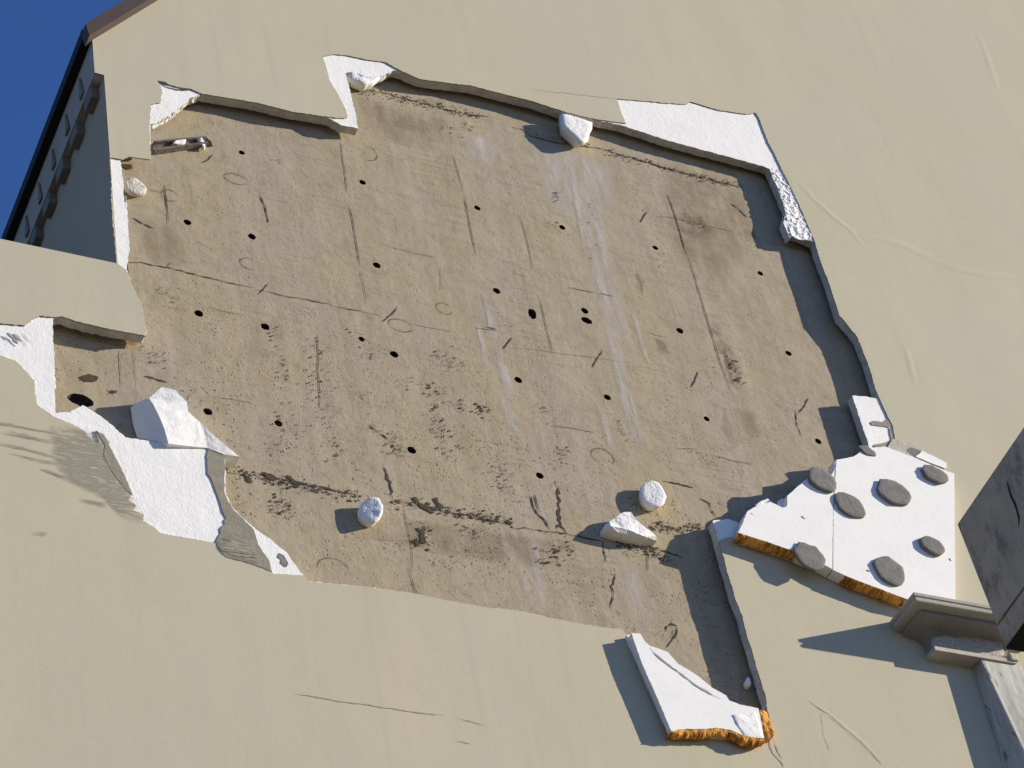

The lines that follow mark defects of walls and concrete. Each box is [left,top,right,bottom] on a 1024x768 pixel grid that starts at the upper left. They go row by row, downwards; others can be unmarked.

spalling [356,88,484,138]
spalling [584,143,743,189]
spalling [770,168,812,241]
spalling [395,373,493,463]
flaking render [870,419,947,469]
flaking render [56,431,139,517]
spalling [237,466,362,520]
spalling [390,495,514,577]
spalling [534,536,574,571]
spalling [614,541,672,564]
spalling [650,520,704,534]
crack [296,694,482,744]